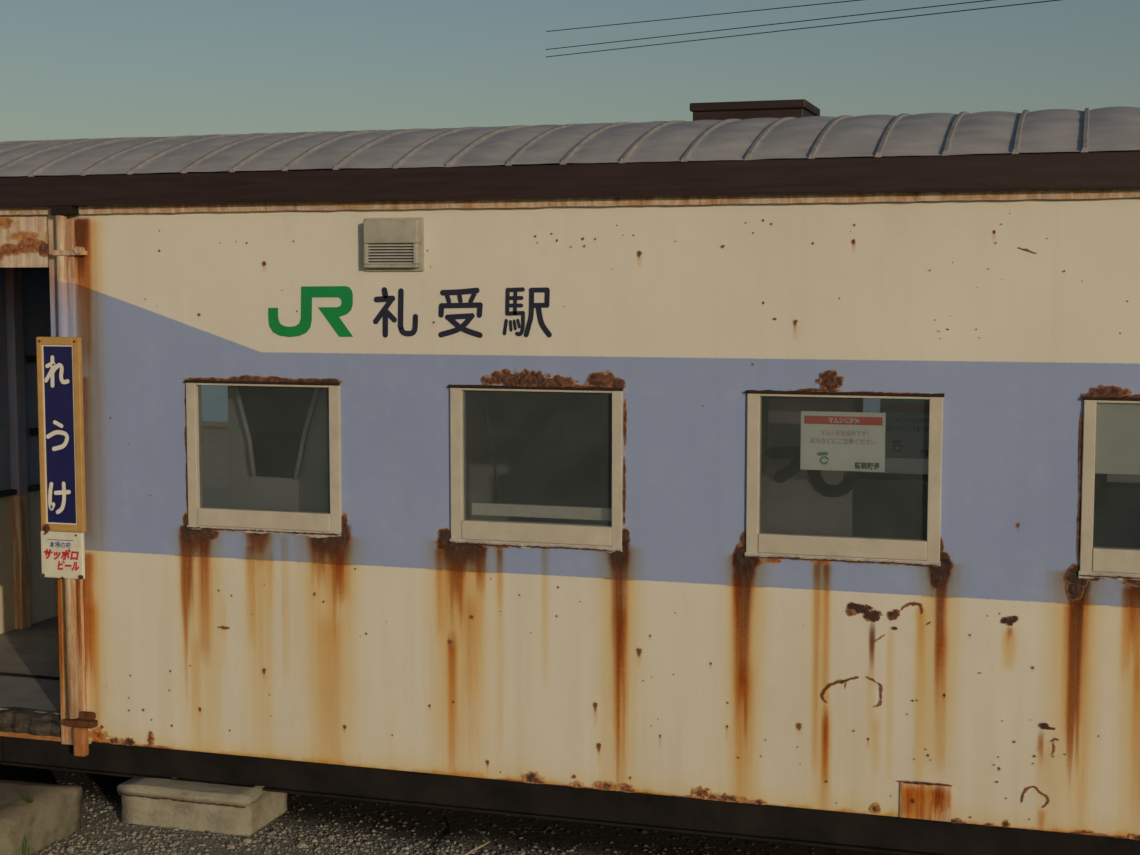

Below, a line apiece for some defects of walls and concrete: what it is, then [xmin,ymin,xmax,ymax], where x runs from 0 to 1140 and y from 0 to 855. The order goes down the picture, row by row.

corrosion [0,216,49,260]
corrosion [1082,385,1140,398]
corrosion [313,513,350,564]
corrosion [437,528,509,569]
corrosion [481,369,630,629]
corrosion [733,531,782,633]
corrosion [930,536,953,627]
corrosion [1064,411,1100,694]